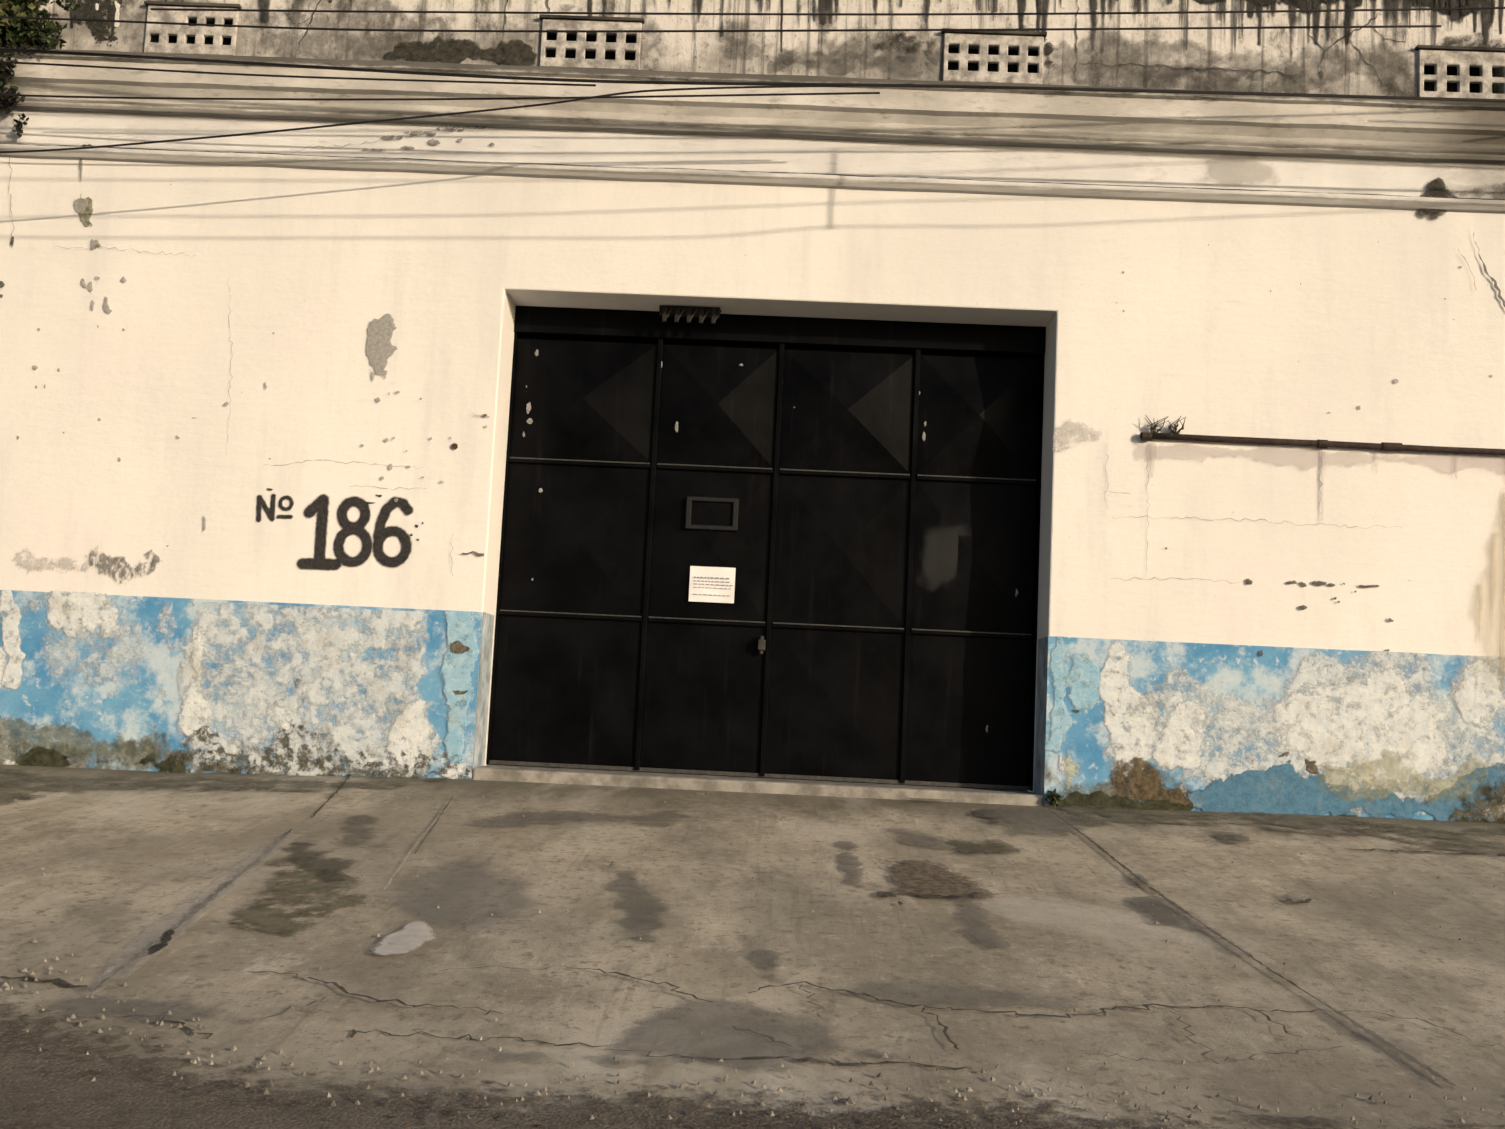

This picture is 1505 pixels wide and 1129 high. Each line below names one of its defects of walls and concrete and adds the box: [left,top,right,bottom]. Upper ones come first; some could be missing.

mould [384,36,537,66]
leakage [1017,0,1062,66]
leakage [1167,0,1505,57]
peeling [73,197,100,250]
leakage [1418,177,1505,219]
crack [1478,254,1505,307]
peeling [366,314,400,402]
peeling [0,590,480,779]
peeling [1045,636,1505,813]
crack [1,976,88,988]
crack [123,1014,213,1039]
crack [258,965,1504,1070]